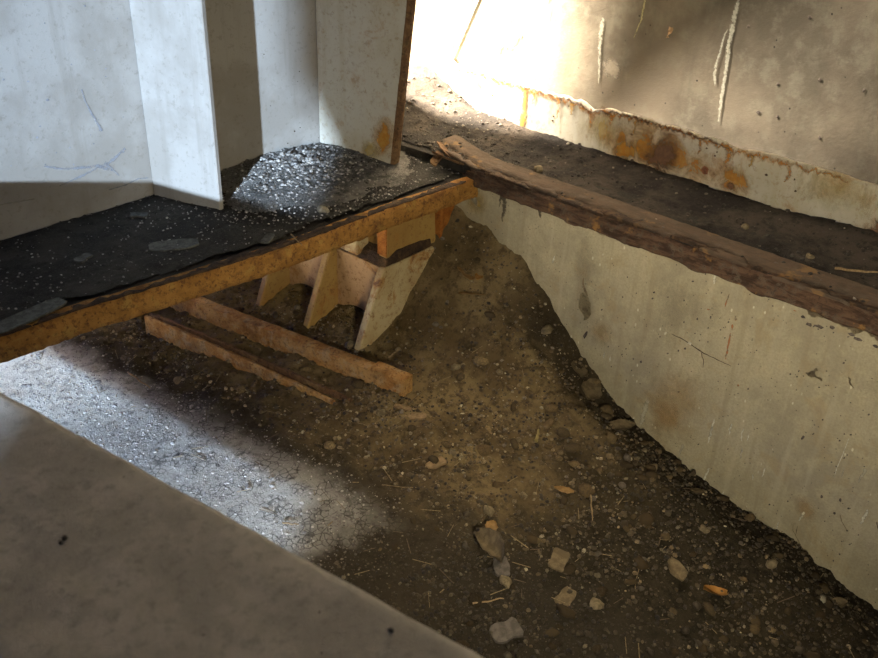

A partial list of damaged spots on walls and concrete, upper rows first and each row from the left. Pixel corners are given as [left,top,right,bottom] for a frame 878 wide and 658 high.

water stain [713,0,739,122]
corrosion [430,141,532,191]
corrosion [454,65,848,192]